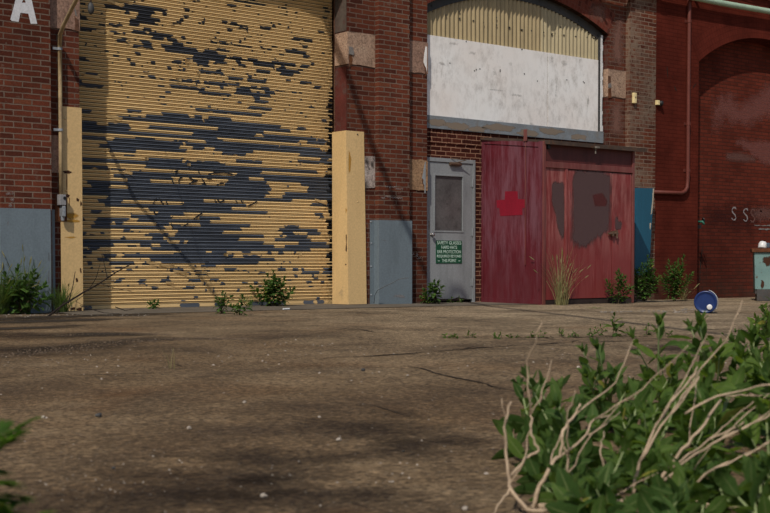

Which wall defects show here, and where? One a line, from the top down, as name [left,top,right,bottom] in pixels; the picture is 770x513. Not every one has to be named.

peeling [74,0,352,307]